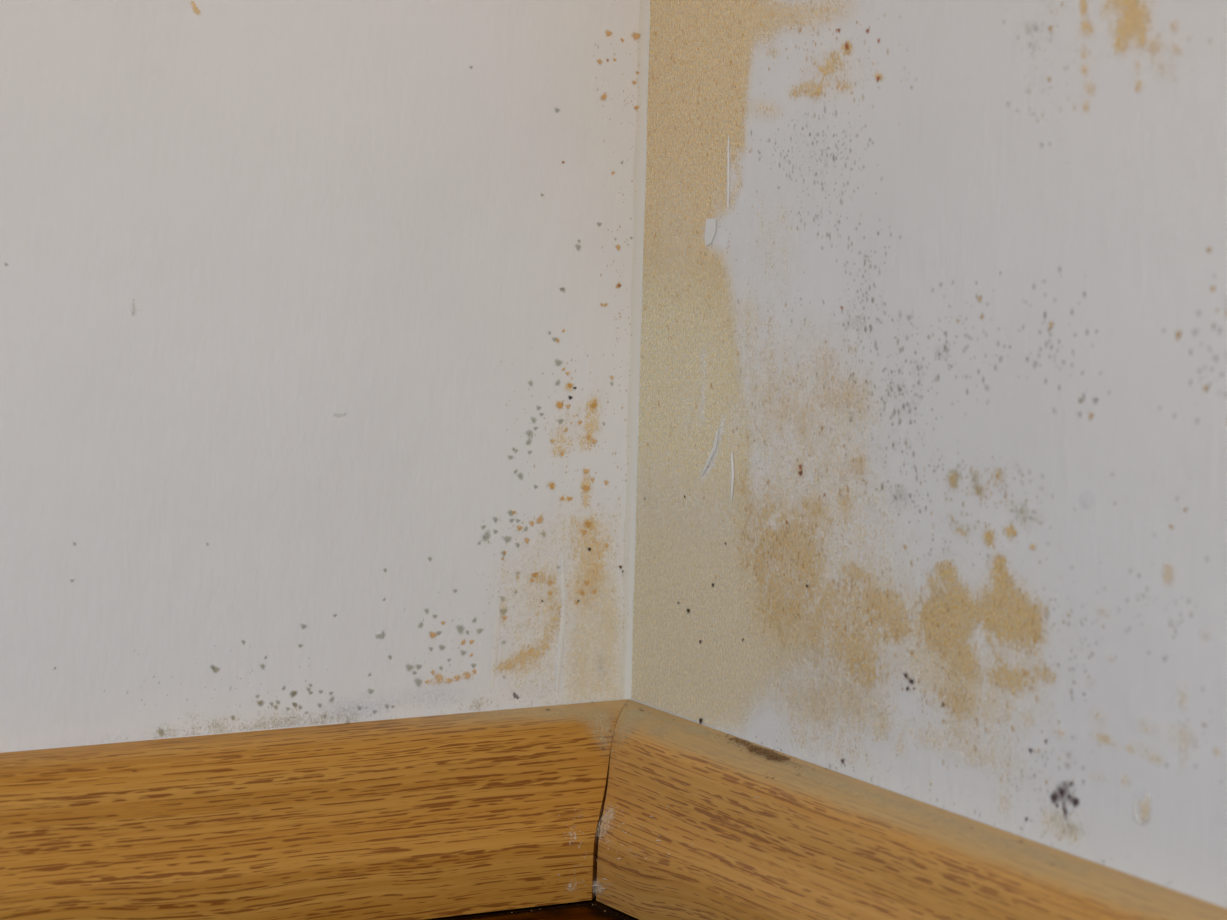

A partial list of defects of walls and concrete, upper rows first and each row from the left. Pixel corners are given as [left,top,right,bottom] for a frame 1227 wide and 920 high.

leakage [498,0,1055,744]